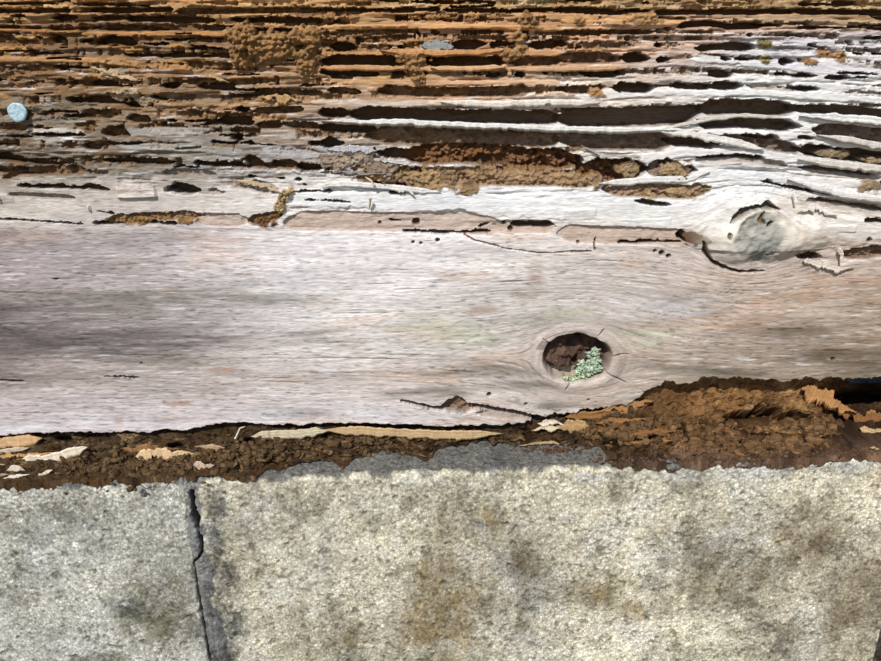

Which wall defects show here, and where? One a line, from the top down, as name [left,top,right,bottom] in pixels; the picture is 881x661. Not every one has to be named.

crack [189,489,212,661]